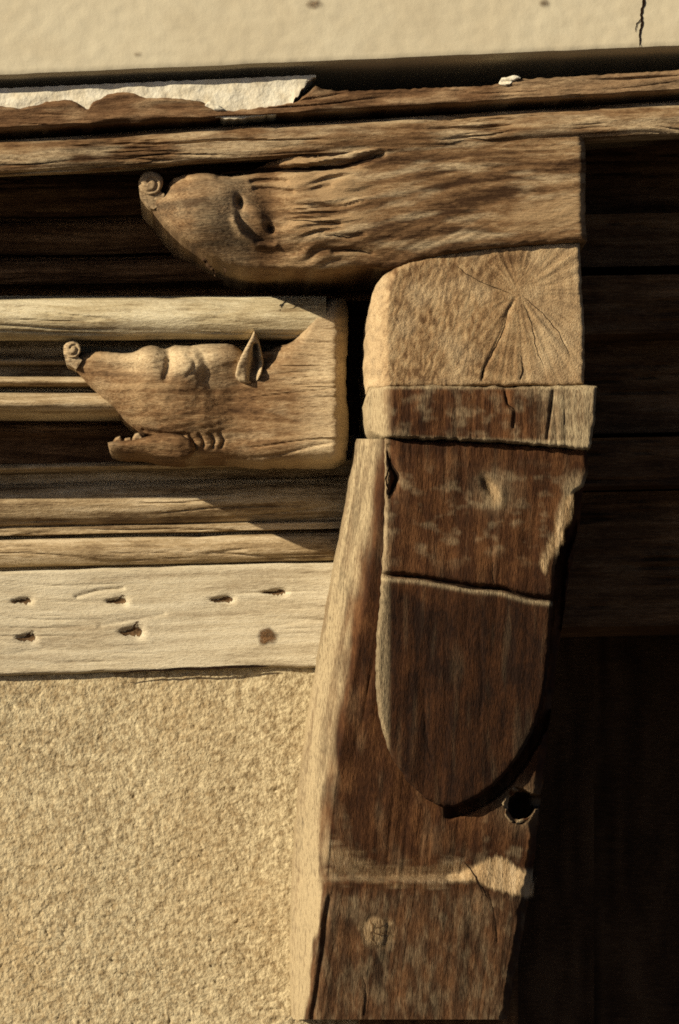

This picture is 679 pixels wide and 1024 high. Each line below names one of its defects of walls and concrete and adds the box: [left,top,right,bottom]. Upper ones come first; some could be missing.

crack [635,0,645,46]